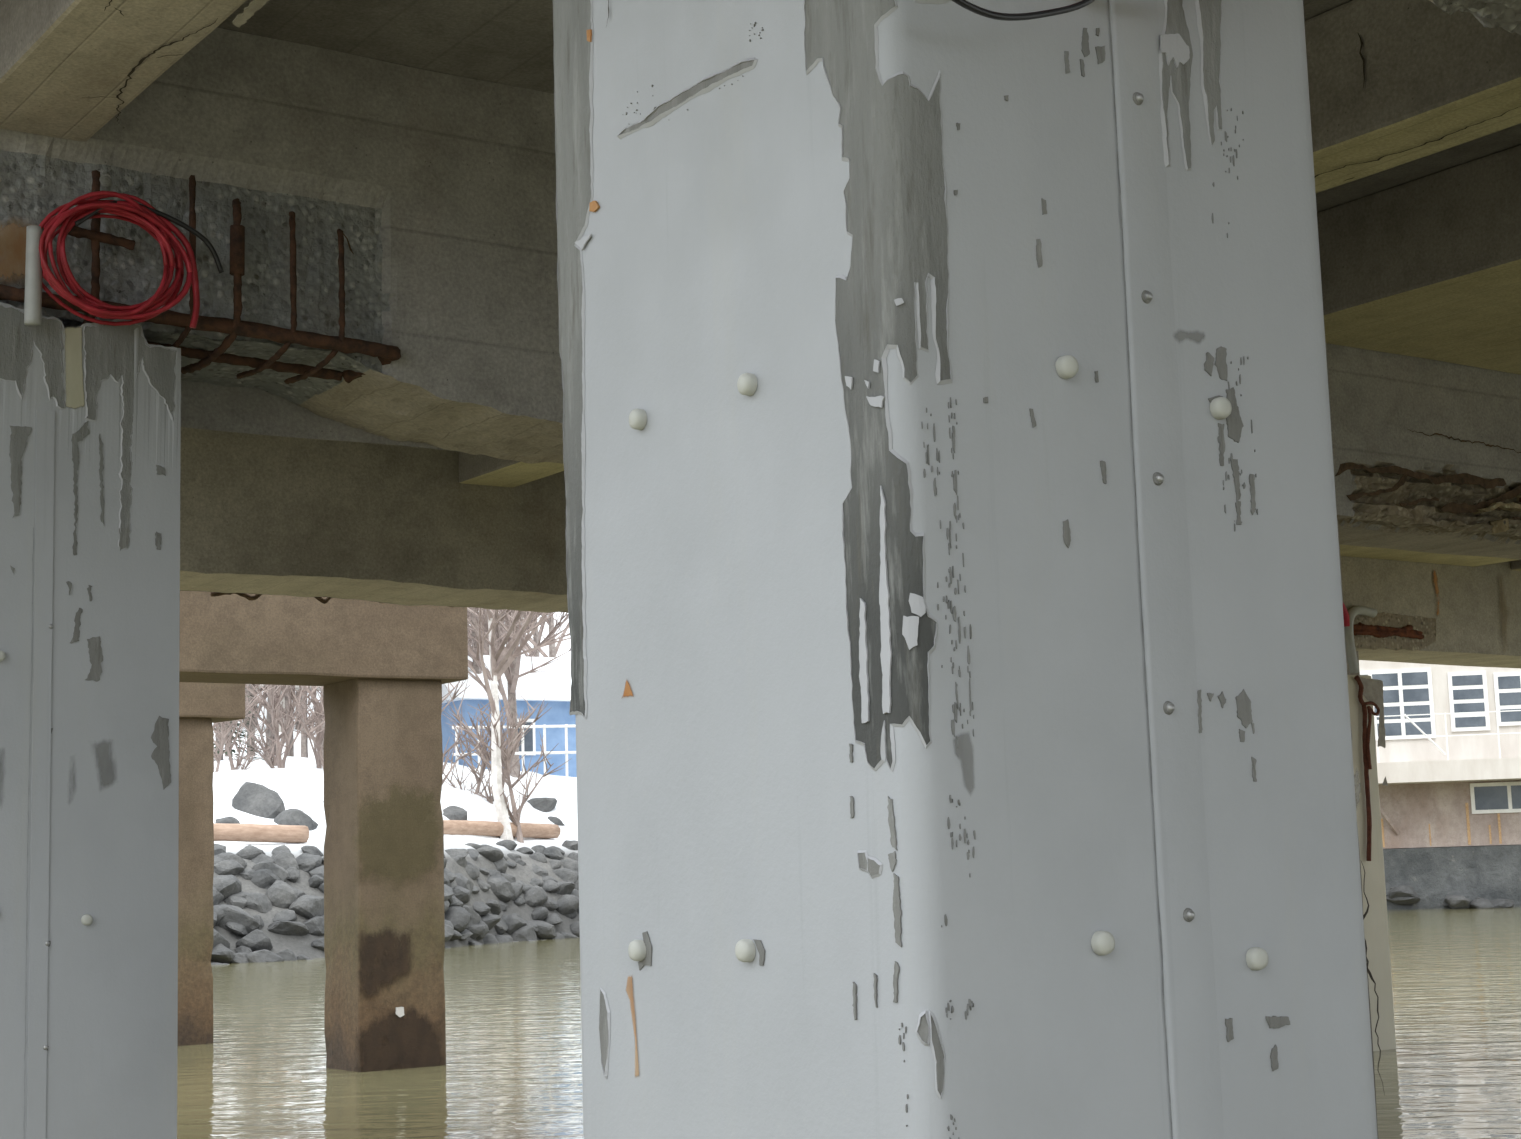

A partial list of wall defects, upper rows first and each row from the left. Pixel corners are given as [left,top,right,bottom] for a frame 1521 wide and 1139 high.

crack [92,18,218,125]
spalling [617,22,764,139]
peeling [1159,0,1244,187]
spalling [0,150,401,555]
peeling [553,0,594,719]
peeling [804,0,976,877]
peeling [1204,346,1258,532]
spalling [1335,462,1521,542]
water stain [359,930,411,996]
water stain [358,1009,442,1072]
corrosion [626,977,639,1076]
peeling [852,796,902,1020]